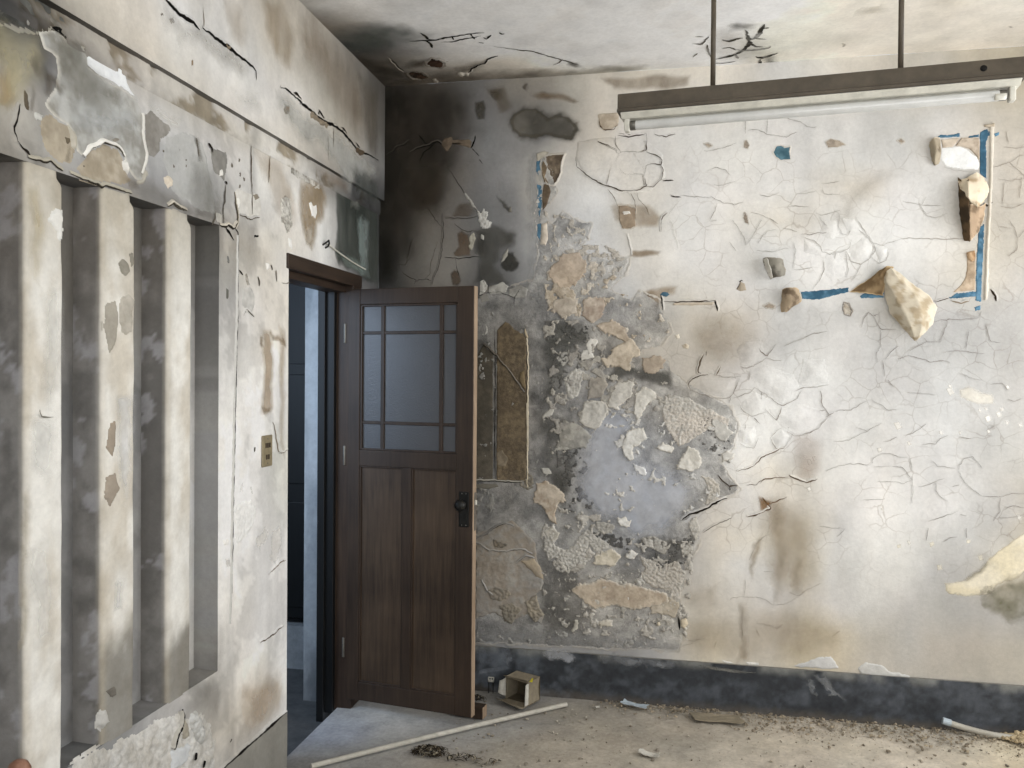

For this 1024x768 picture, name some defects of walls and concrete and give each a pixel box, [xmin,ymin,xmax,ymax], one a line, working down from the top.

crack [9,90,132,194]
peeling [0,0,170,186]
crack [166,0,483,284]
damp [476,91,501,118]
crack [419,32,577,77]
damp [510,108,579,140]
peeling [941,137,980,172]
damp [463,193,519,295]
peeling [102,294,134,353]
flaking render [475,151,742,654]
crack [680,312,1022,637]
flaking render [70,709,216,768]